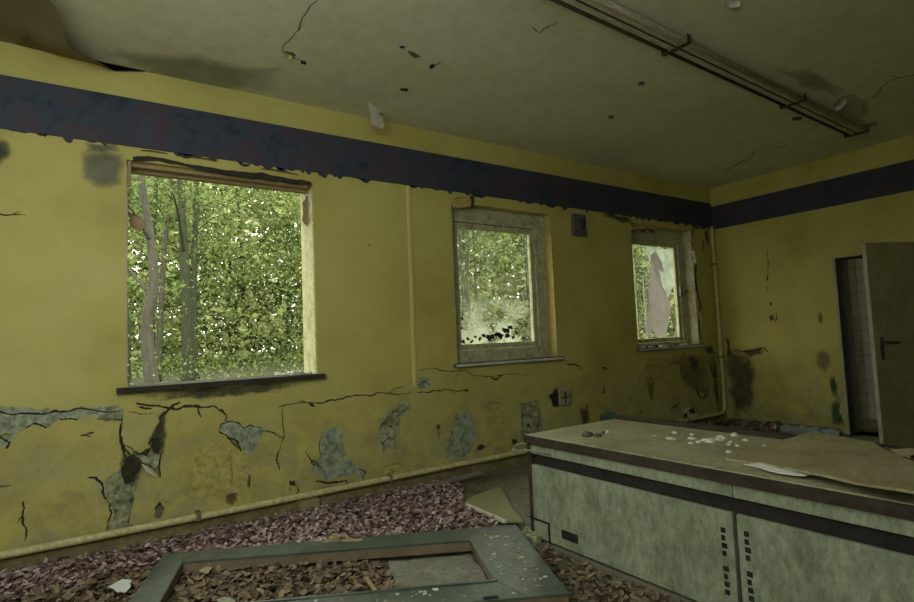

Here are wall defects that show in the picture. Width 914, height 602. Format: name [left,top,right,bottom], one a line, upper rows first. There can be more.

crack [282,0,318,61]
peeling [133,150,311,184]
crack [136,402,227,421]
peeling [378,401,411,453]
crack [275,368,535,470]
peeling [512,400,543,444]
spalling [0,402,181,531]
peeling [306,428,367,484]
crack [17,501,28,541]